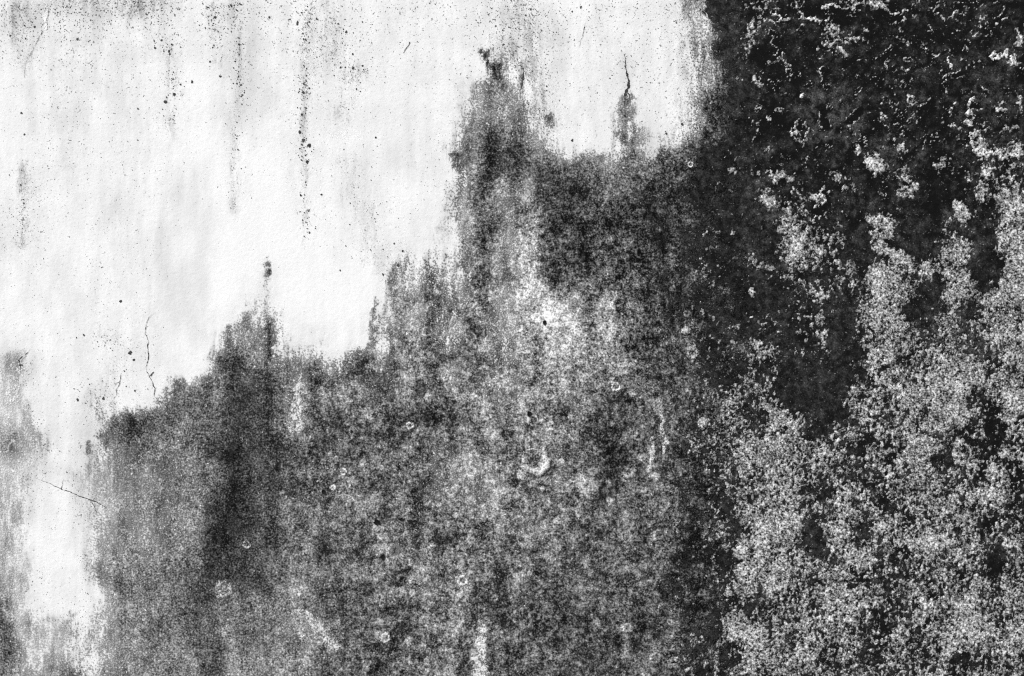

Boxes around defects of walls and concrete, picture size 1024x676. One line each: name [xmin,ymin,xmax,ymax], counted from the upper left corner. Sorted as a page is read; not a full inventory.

leakage [153,37,193,128]
leakage [199,1,250,185]
leakage [286,6,368,240]
crack [623,55,631,96]